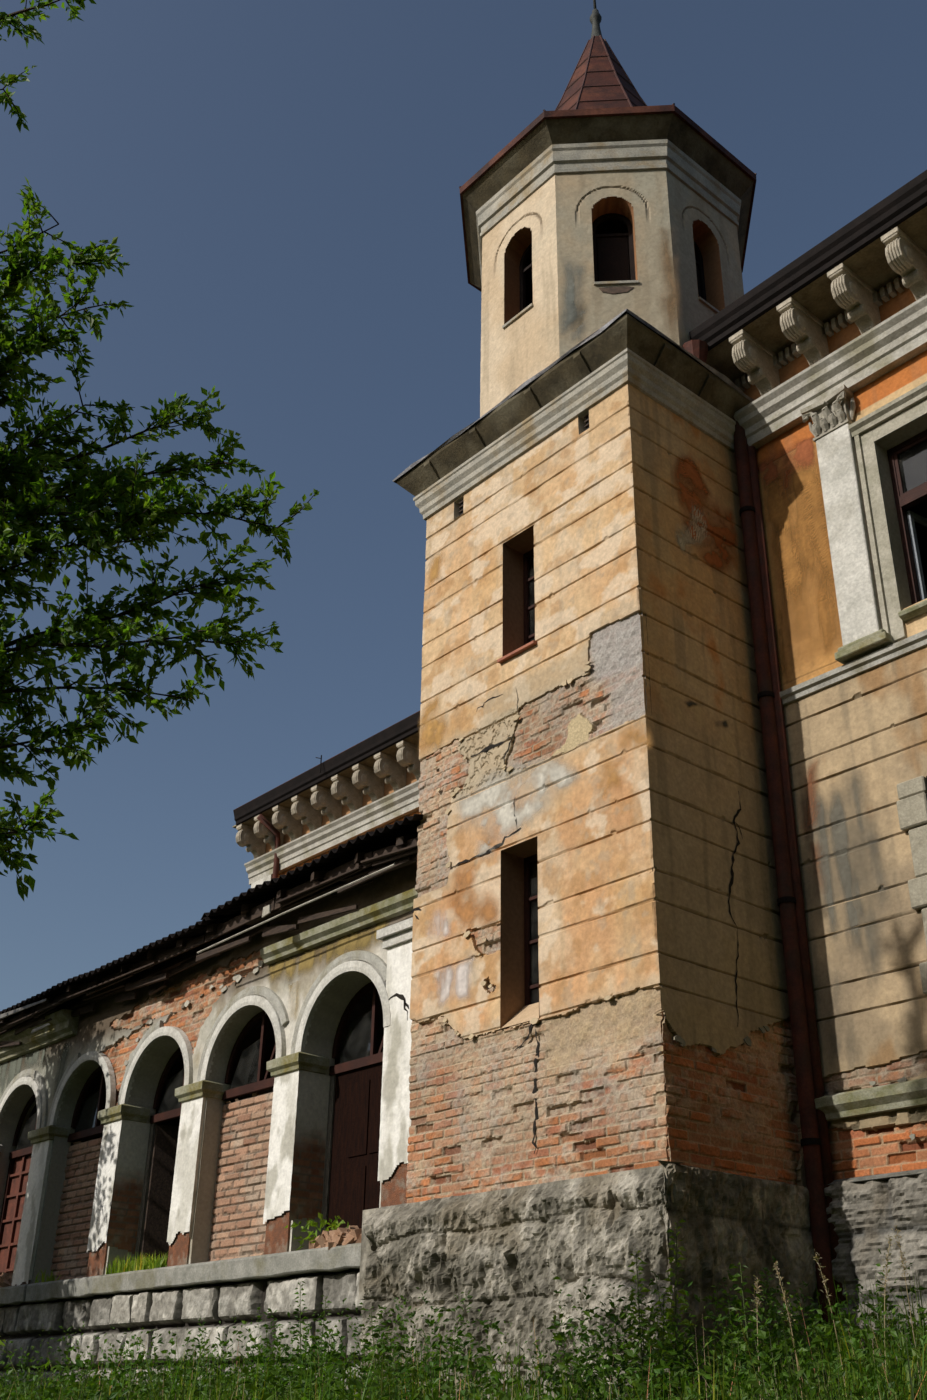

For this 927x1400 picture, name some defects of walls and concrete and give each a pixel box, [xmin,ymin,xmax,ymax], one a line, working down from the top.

flaking render [501,612,648,772]
flaking render [415,737,470,898]
crack [728,791,743,1027]
flaking render [102,951,263,1106]
flaking render [406,986,803,1203]
flaking render [828,1122,927,1180]